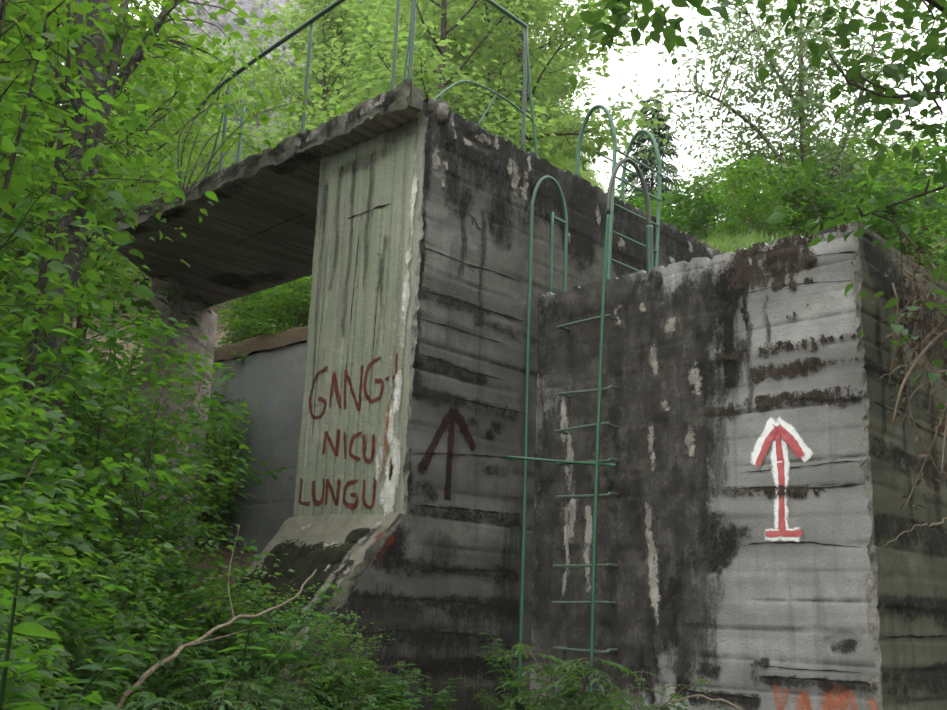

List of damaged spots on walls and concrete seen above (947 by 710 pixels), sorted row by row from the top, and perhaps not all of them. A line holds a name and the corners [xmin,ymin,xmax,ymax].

crack [343,204,389,395]
peeling [727,223,849,292]
damp [290,102,947,710]